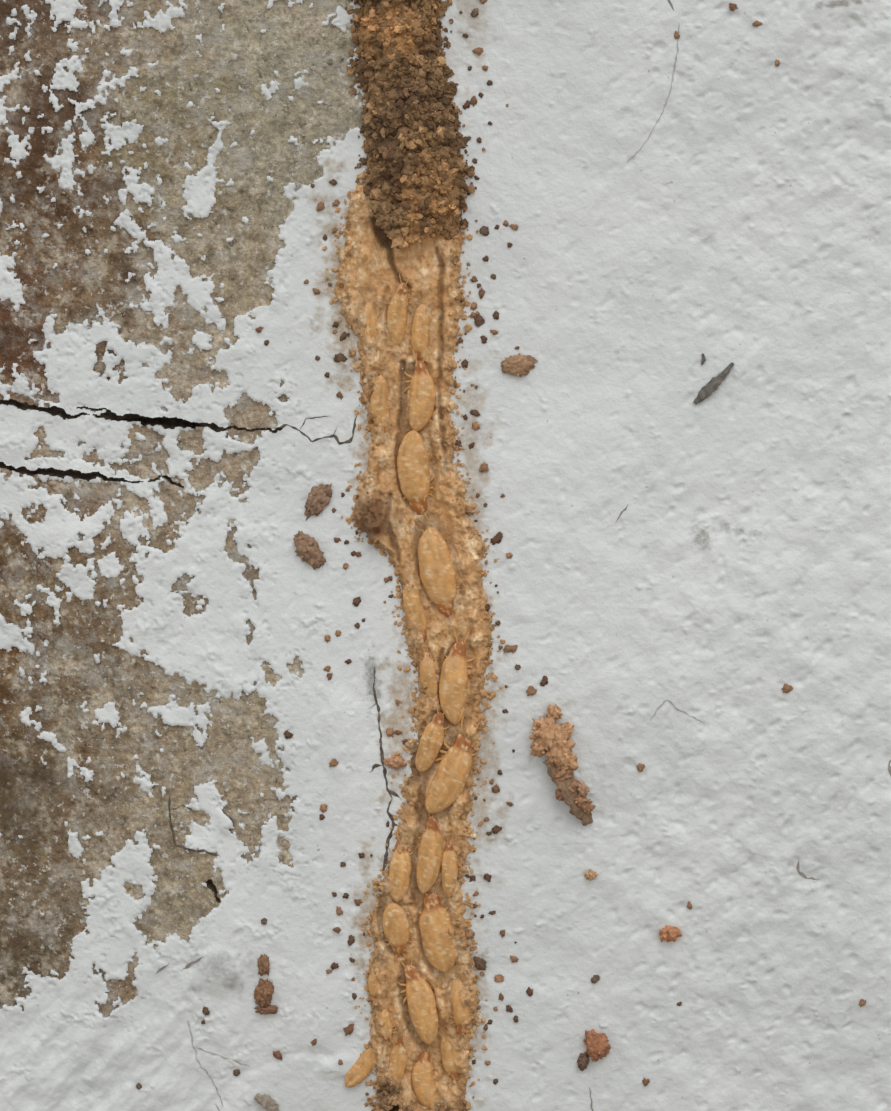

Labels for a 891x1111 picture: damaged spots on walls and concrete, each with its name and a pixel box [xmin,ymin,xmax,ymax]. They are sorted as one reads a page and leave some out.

peeling [0,0,365,412]
crack [0,462,184,488]
crack [0,399,357,445]
peeling [0,380,305,1017]